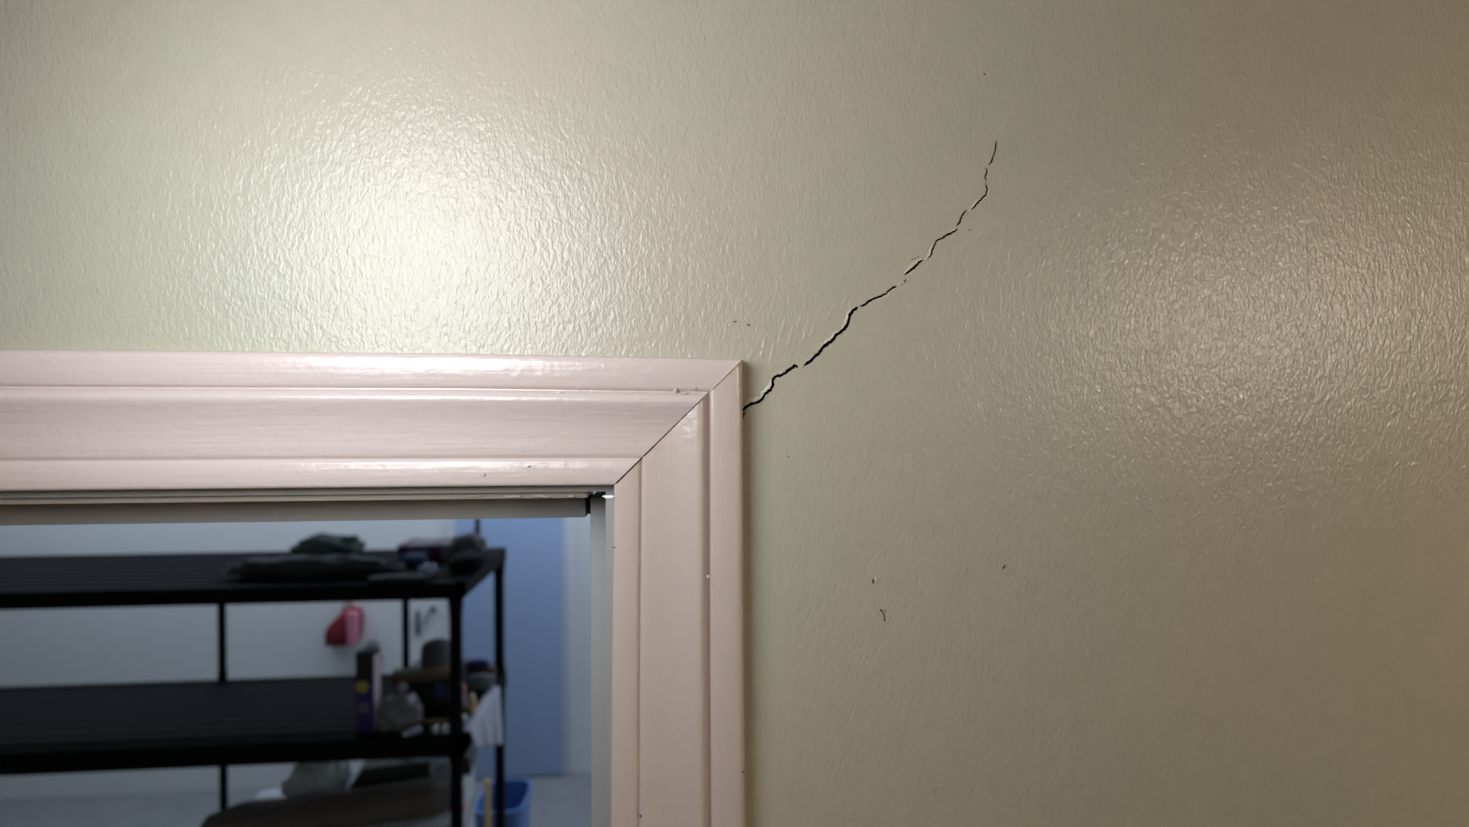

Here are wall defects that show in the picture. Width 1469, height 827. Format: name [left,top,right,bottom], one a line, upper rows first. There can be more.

crack [615,141,998,484]